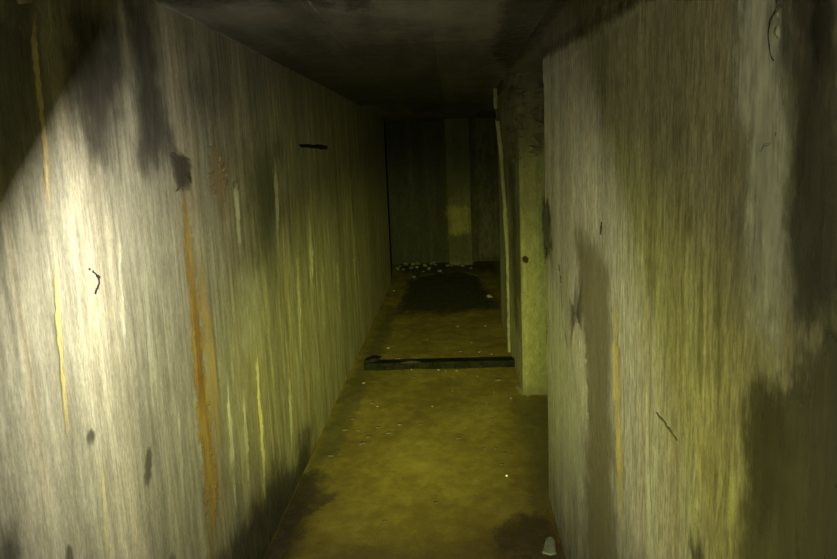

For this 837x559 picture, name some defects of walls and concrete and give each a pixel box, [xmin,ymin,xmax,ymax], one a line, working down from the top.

rust [173,153,191,190]
rust [184,211,217,530]
damp [728,0,837,559]